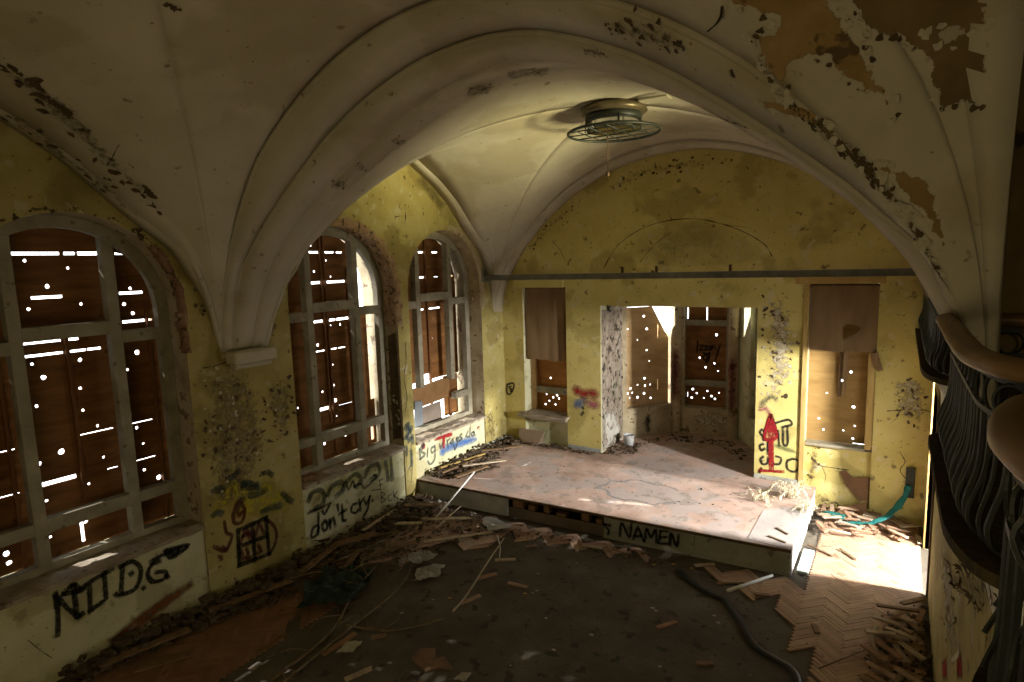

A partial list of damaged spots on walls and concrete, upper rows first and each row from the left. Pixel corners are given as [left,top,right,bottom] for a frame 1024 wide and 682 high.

peeling [604,6,685,54]
peeling [721,0,996,288]
crack [604,217,772,268]
peeling [201,366,298,507]
spalling [601,310,622,451]
peeling [758,293,800,399]
peeling [896,377,928,428]